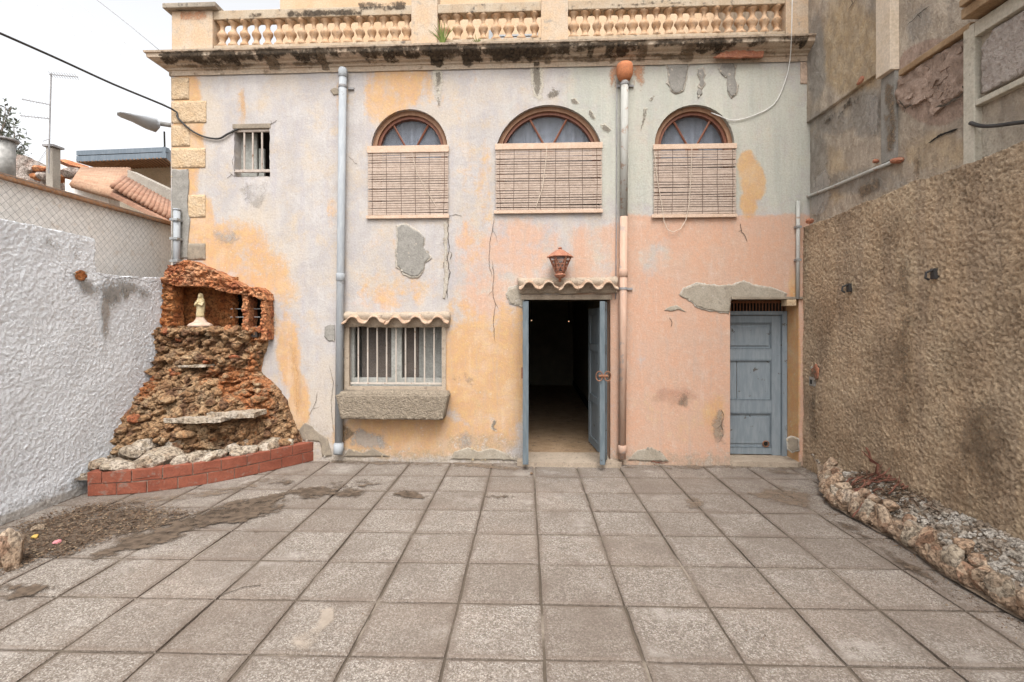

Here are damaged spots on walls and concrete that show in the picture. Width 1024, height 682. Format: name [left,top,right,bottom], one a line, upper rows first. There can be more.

leakage [159,36,767,106]
mould [780,35,809,49]
spalling [895,40,963,115]
crack [443,214,460,297]
leakage [80,280,150,336]
spalling [299,423,390,457]